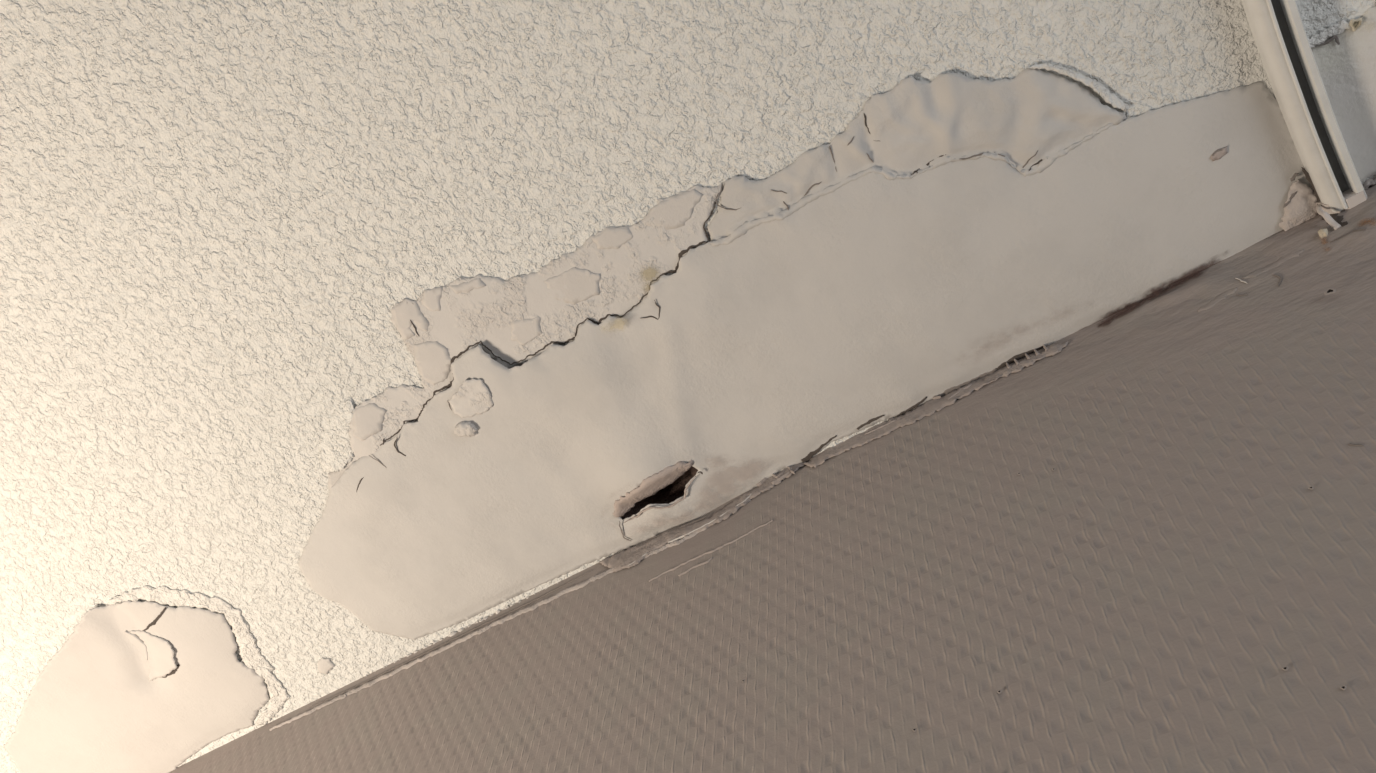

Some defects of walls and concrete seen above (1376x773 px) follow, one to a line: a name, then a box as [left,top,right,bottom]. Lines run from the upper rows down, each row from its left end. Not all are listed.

crack [356,202,716,492]
peeling [318,63,1130,492]
flaking render [1210,146,1228,161]
flaking render [1279,167,1348,231]
peeling [1308,5,1376,183]
spalling [613,460,703,541]
peeling [3,585,290,773]